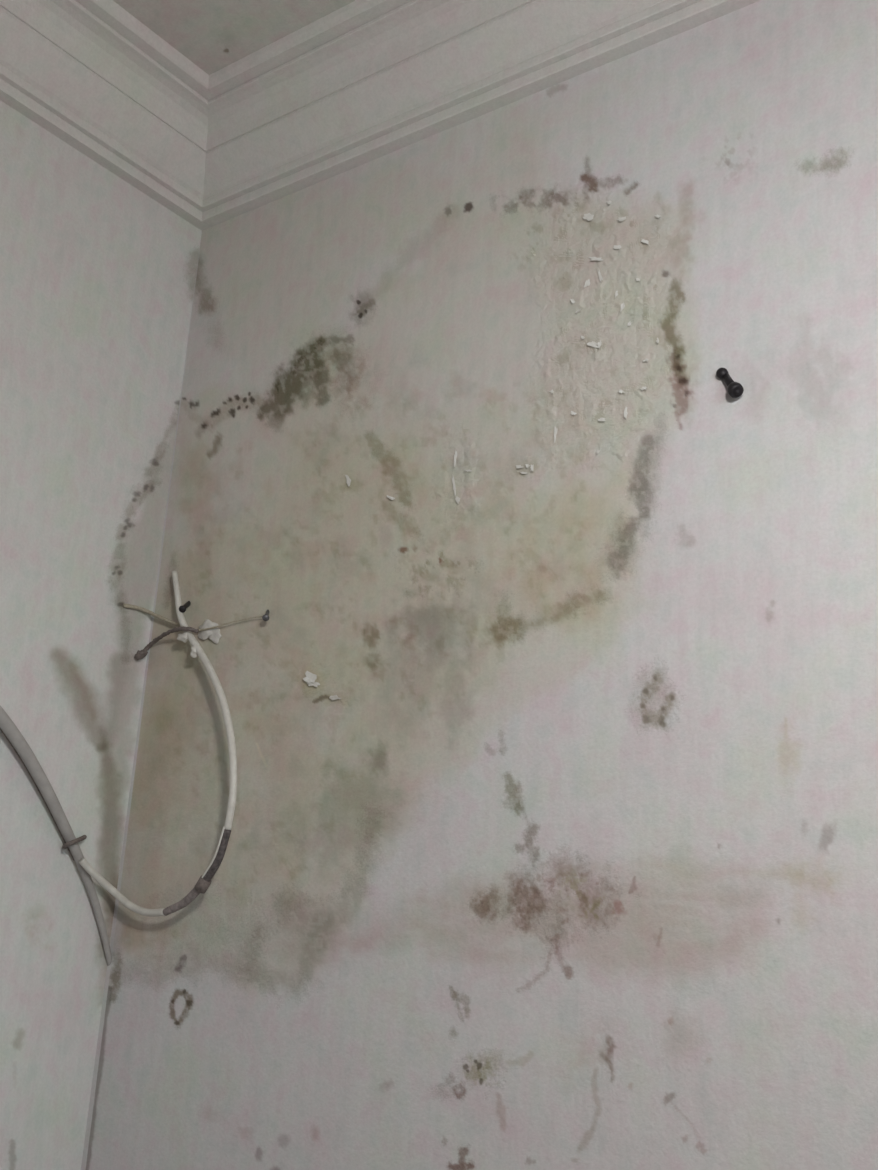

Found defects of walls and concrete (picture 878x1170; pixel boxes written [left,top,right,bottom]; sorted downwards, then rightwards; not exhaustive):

water stain [89,65,868,1030]
peeling [500,178,689,482]